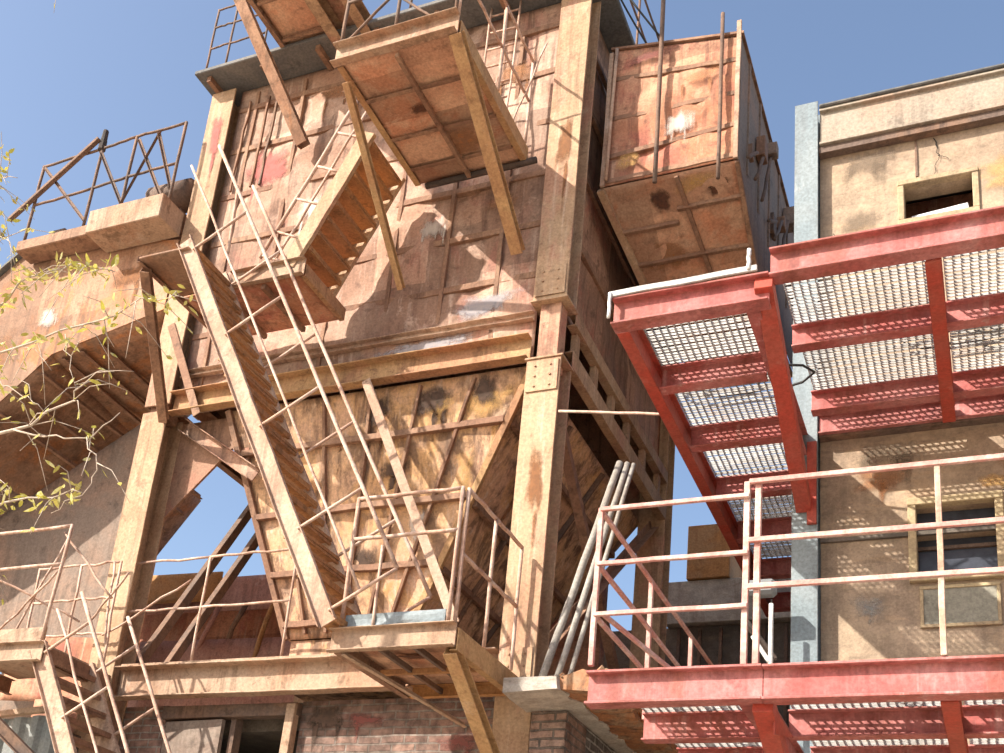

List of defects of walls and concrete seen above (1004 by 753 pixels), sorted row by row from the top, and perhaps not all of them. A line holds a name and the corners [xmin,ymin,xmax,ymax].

peeling [459,291,511,318]
damp [474,374,494,403]
damp [414,387,452,425]